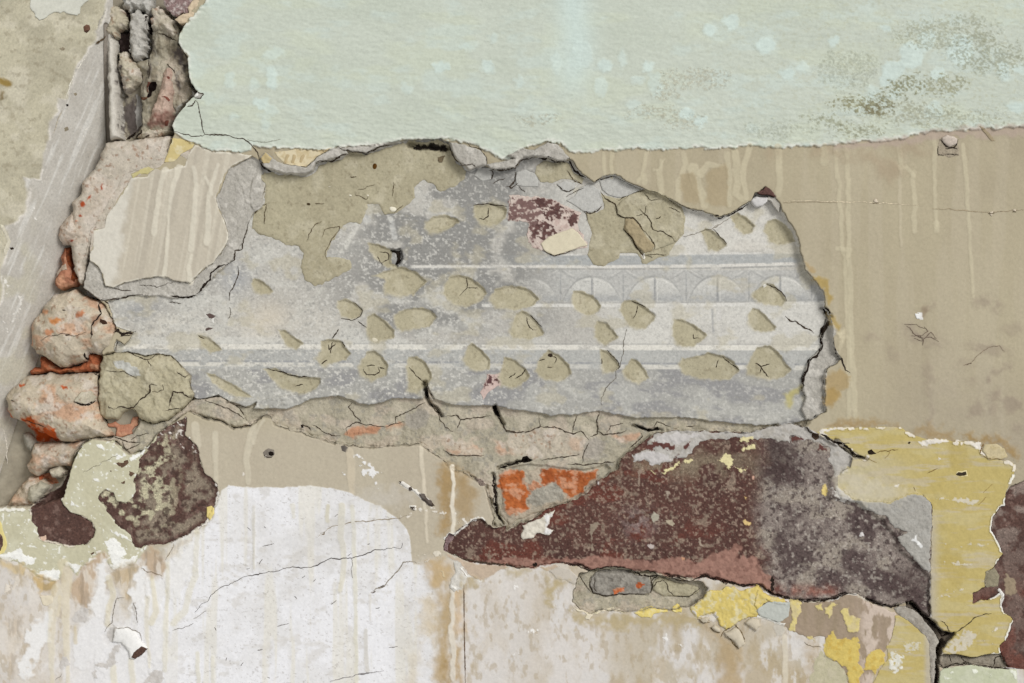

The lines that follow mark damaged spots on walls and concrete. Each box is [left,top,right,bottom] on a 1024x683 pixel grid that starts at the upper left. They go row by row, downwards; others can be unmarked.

spalling [135,23,204,139]
leakage [635,11,1024,437]
flaking render [83,120,1024,683]
crack [492,459,526,522]
crack [175,515,415,630]